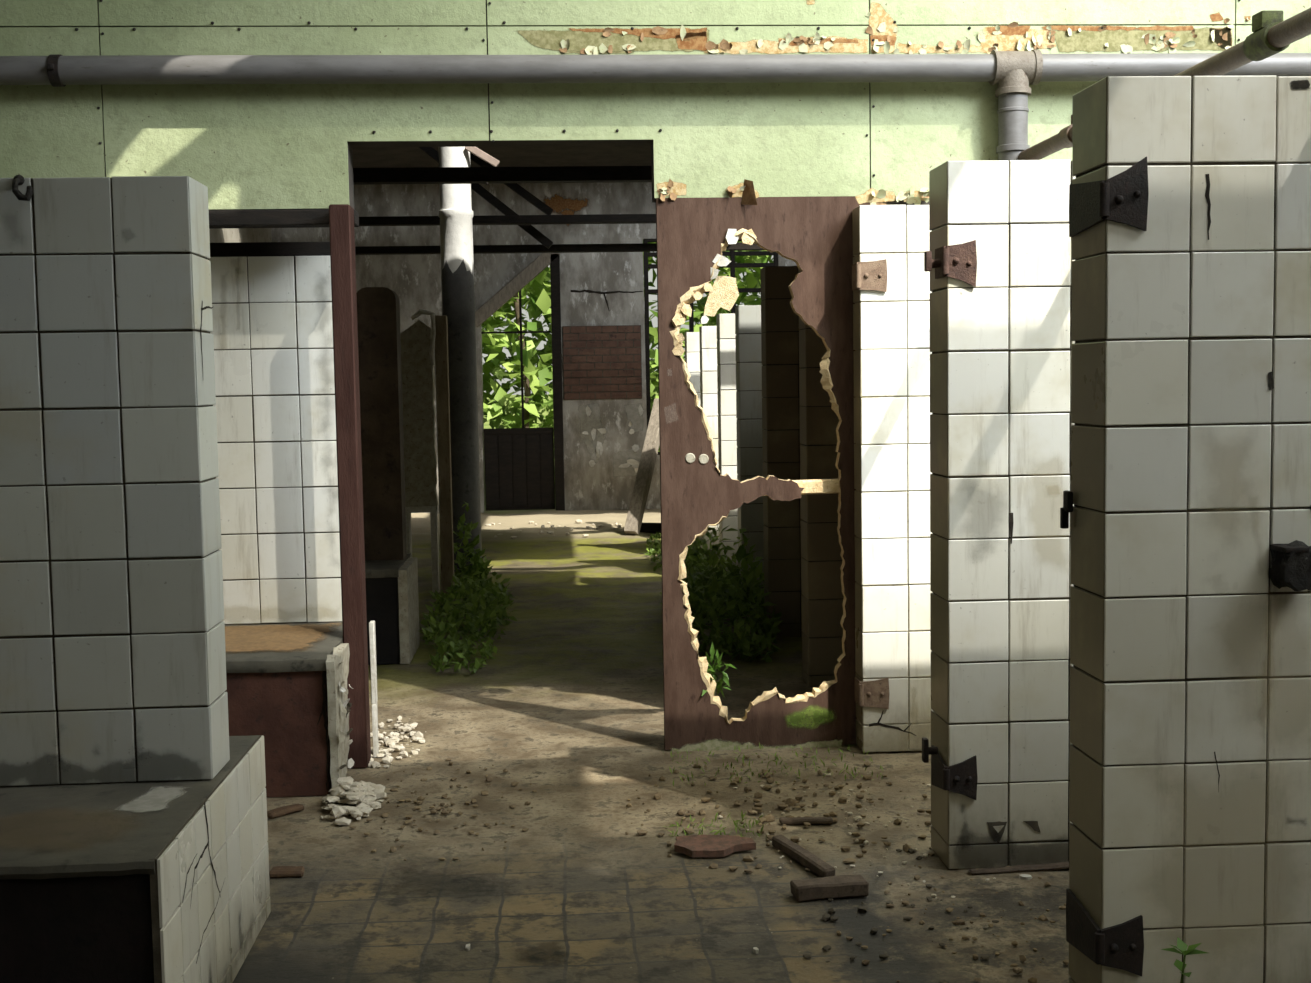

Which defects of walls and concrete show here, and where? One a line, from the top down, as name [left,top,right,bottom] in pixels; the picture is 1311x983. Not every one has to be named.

peeling [518,2,1251,55]
peeling [672,229,757,356]
crack [182,802,226,964]